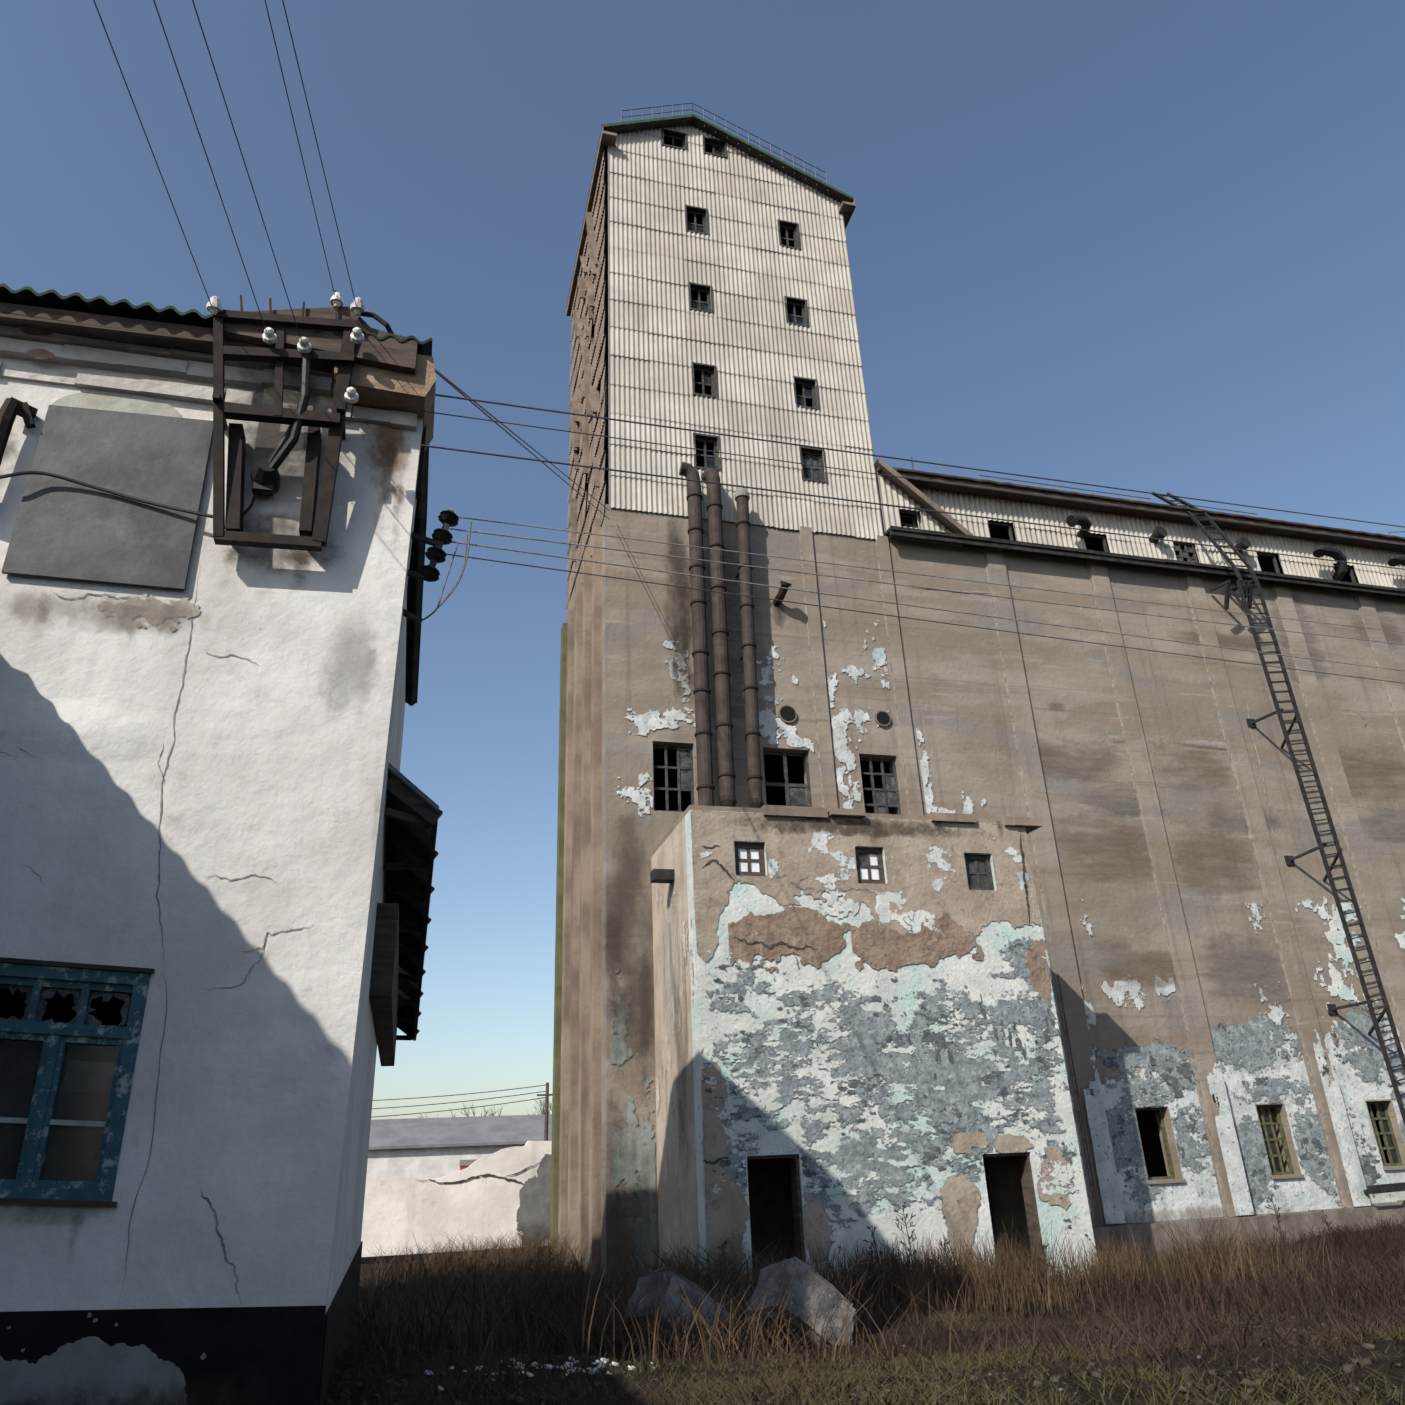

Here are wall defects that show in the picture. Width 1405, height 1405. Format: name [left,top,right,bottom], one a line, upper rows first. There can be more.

crack [119,571,258,1303]
crack [206,874,278,884]
crack [204,924,313,990]
peeling [610,620,1092,1282]
peeling [1080,974,1217,1214]
peeling [1245,902,1266,934]
peeling [1208,981,1342,1212]
peeling [1295,896,1405,1142]
peeling [1347,1107,1381,1201]
peeling [0,1312,187,1405]